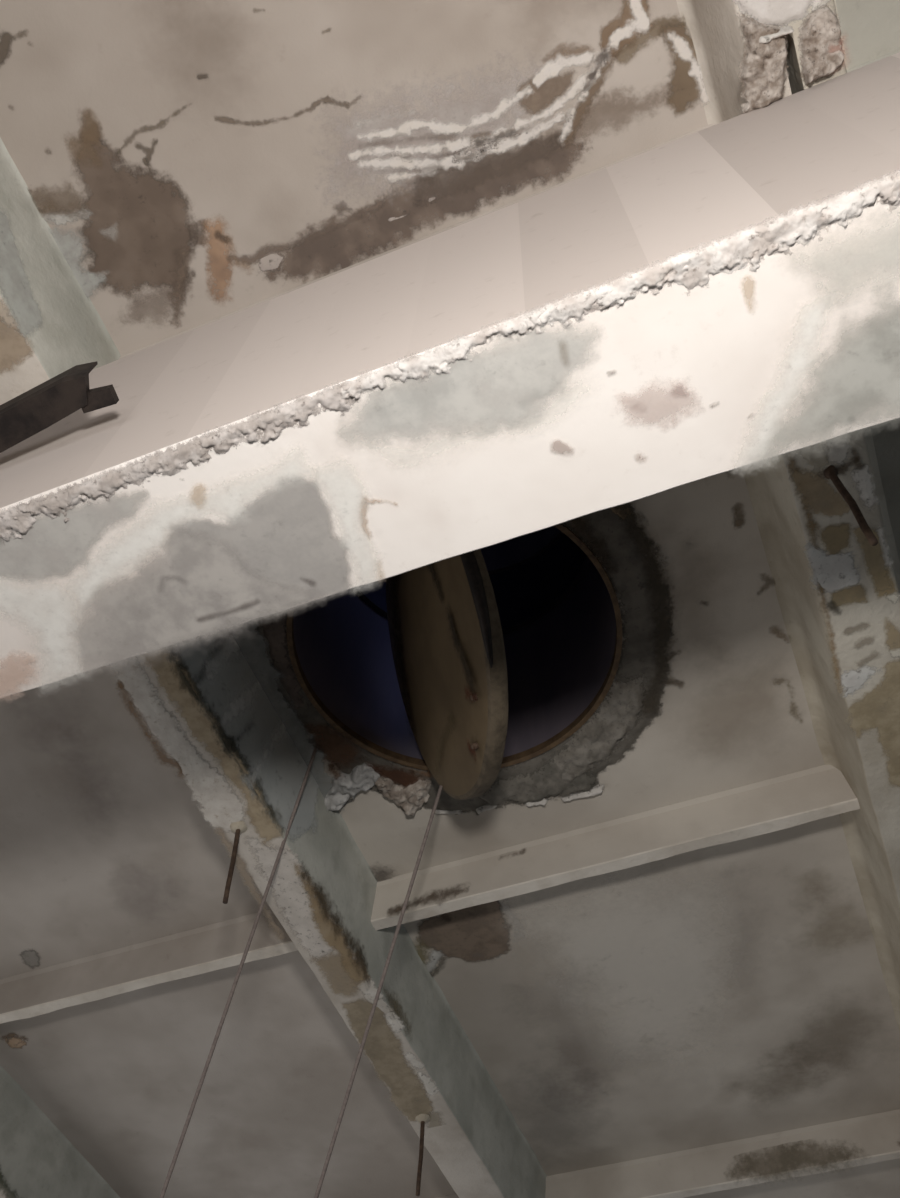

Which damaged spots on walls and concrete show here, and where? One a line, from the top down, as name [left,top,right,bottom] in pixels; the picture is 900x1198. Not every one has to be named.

spalling [737,0,844,113]
spalling [0,171,900,542]
water stain [742,297,900,464]
water stain [0,455,374,798]
water stain [568,517,617,572]
peeling [787,435,900,787]
spalling [324,762,497,816]
peeling [525,784,604,807]
peeling [109,647,441,1128]
water stain [737,1144,851,1178]